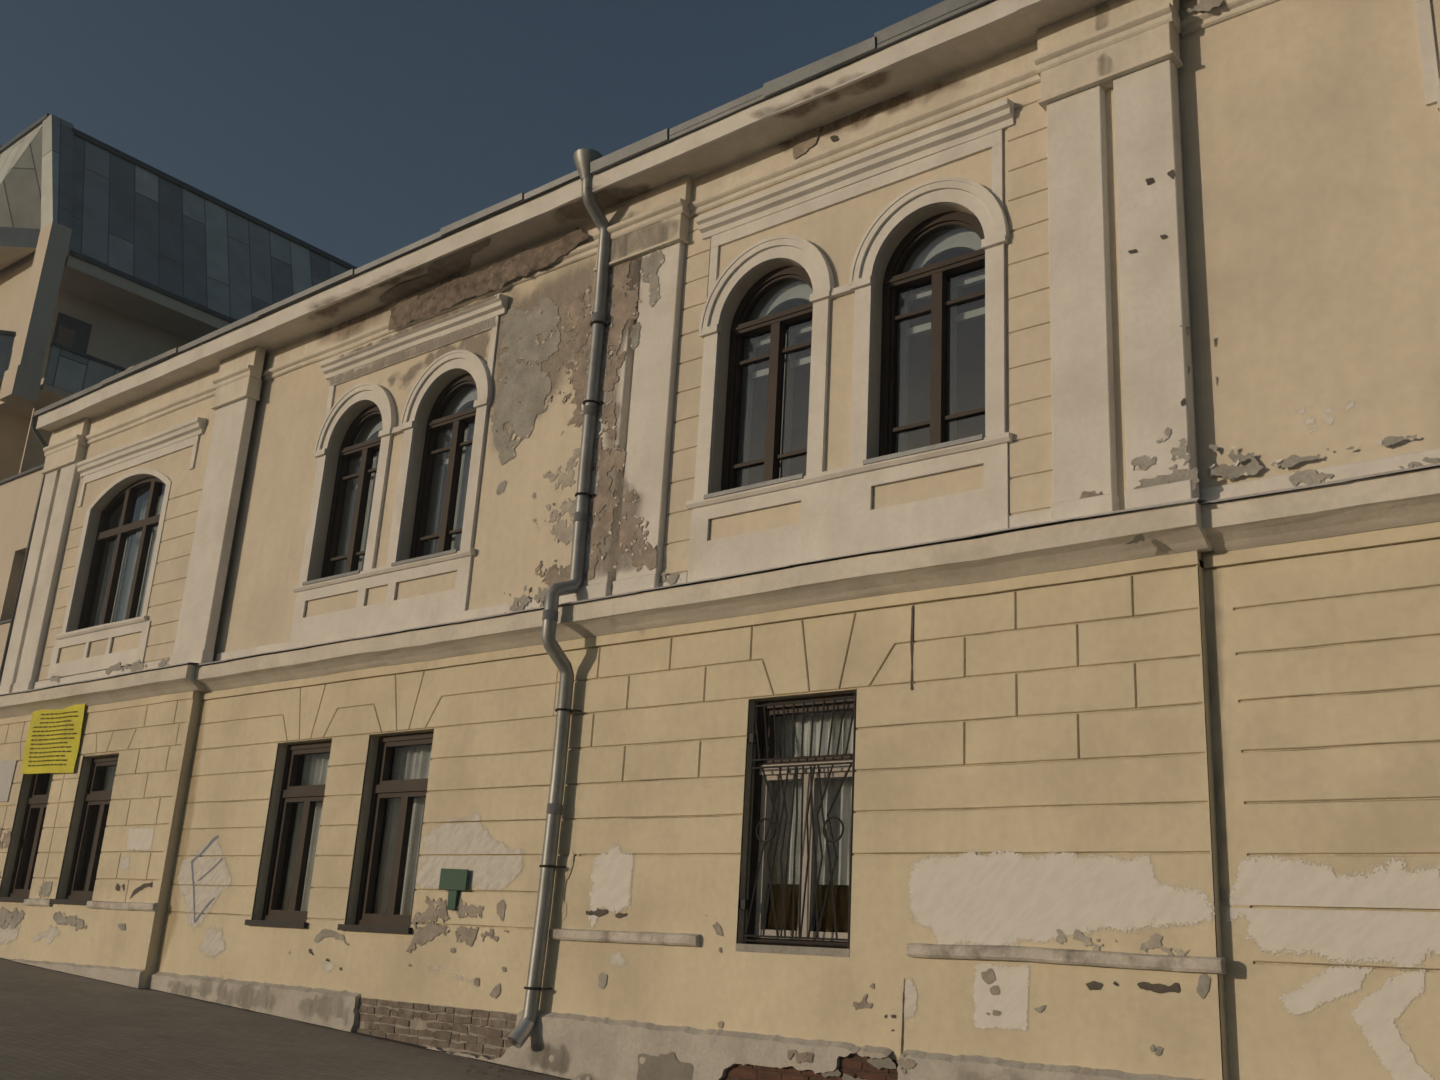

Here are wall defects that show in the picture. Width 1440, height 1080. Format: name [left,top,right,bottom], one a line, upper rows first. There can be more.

flaking render [792,128,838,159]
flaking render [380,227,588,331]
peeling [488,249,680,613]
peeling [1129,427,1333,492]
crack [907,606,915,690]
peeling [406,896,509,966]
flaking render [722,1050,916,1080]